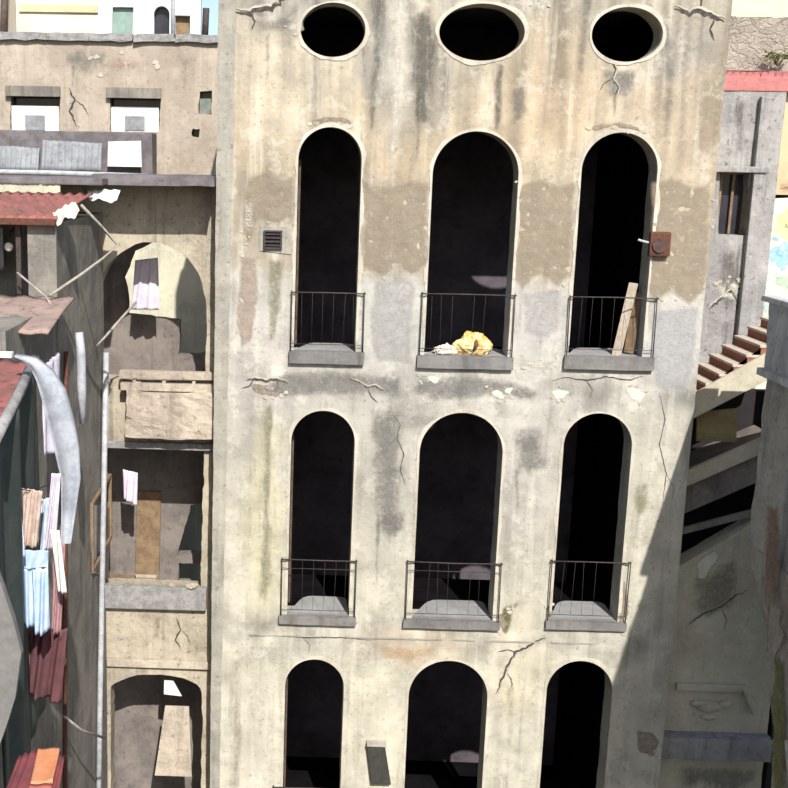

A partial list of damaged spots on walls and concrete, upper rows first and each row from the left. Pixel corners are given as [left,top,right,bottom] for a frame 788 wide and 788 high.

crack [236,0,283,29]
crack [674,0,726,40]
leakage [413,14,435,121]
crack [599,61,620,99]
crack [69,88,89,126]
flaking render [252,382,288,400]
crack [385,414,405,483]
leakage [520,435,544,468]
crack [659,393,674,505]
crack [175,617,191,649]
crack [497,638,547,695]
flaking render [634,727,660,757]